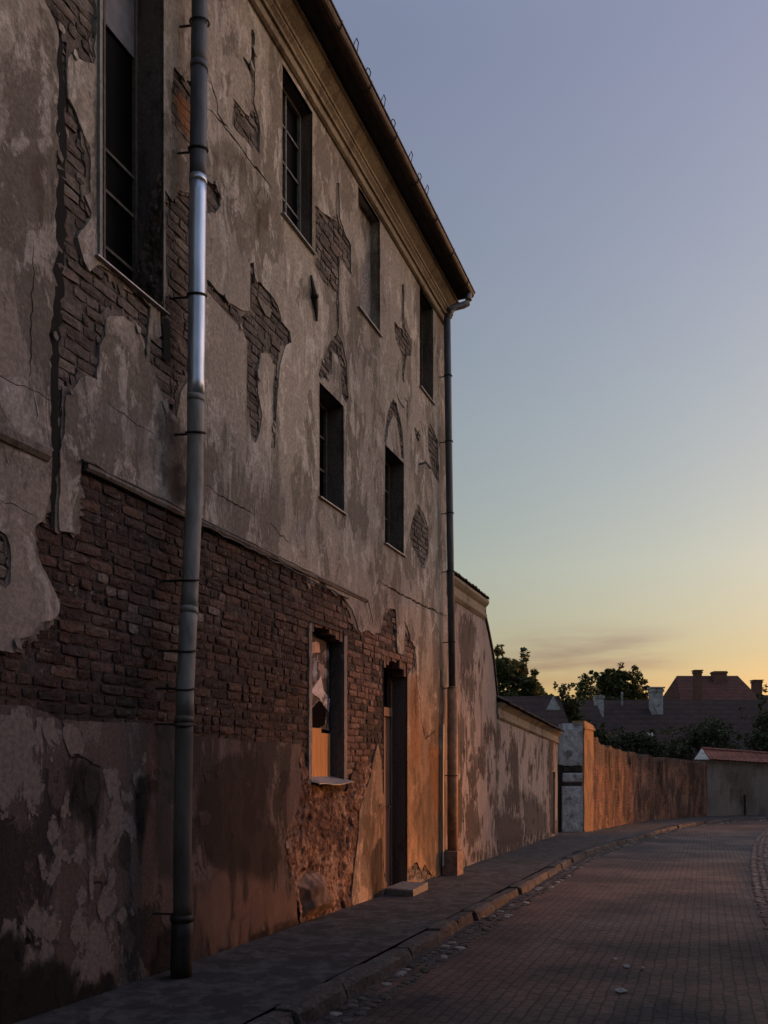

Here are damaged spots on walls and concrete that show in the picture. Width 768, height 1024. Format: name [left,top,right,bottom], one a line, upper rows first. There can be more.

spalling [232,30,259,152]
spalling [44,0,191,448]
spalling [207,263,291,448]
spalling [315,183,350,402]
spalling [394,286,411,381]
spalling [384,400,439,483]
spalling [410,505,428,569]
flaking render [0,462,185,992]
leakage [135,774,151,861]
leakage [197,749,299,955]
flaking render [193,526,416,923]
leakage [0,930,117,1024]